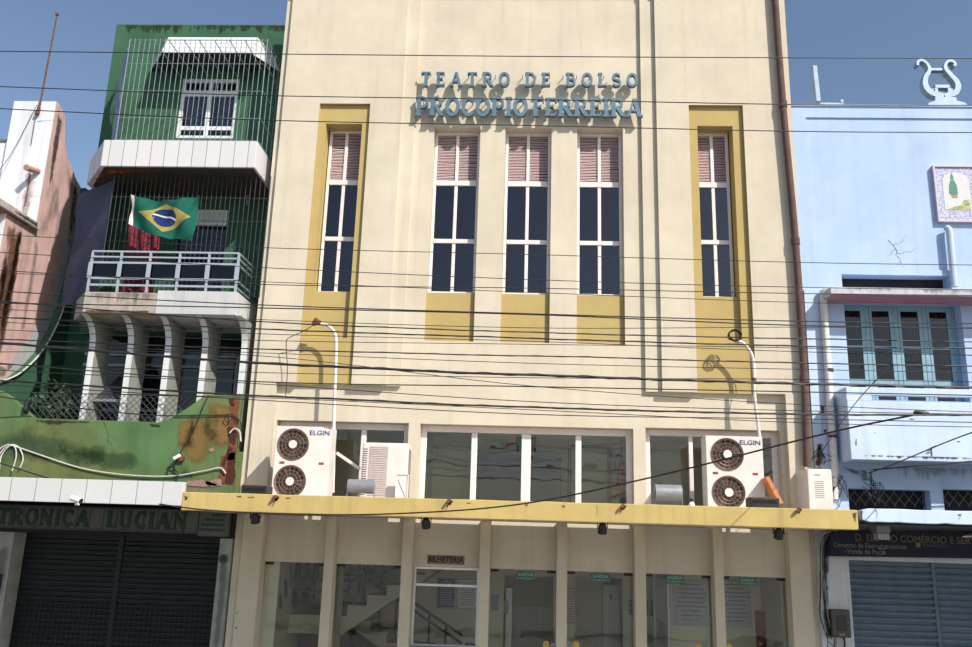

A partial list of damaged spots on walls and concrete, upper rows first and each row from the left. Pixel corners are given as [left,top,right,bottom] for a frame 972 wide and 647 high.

leakage [50,116,61,179]
leakage [69,178,78,242]
leakage [0,229,22,351]
leakage [4,435,134,467]
peeling [178,397,239,487]